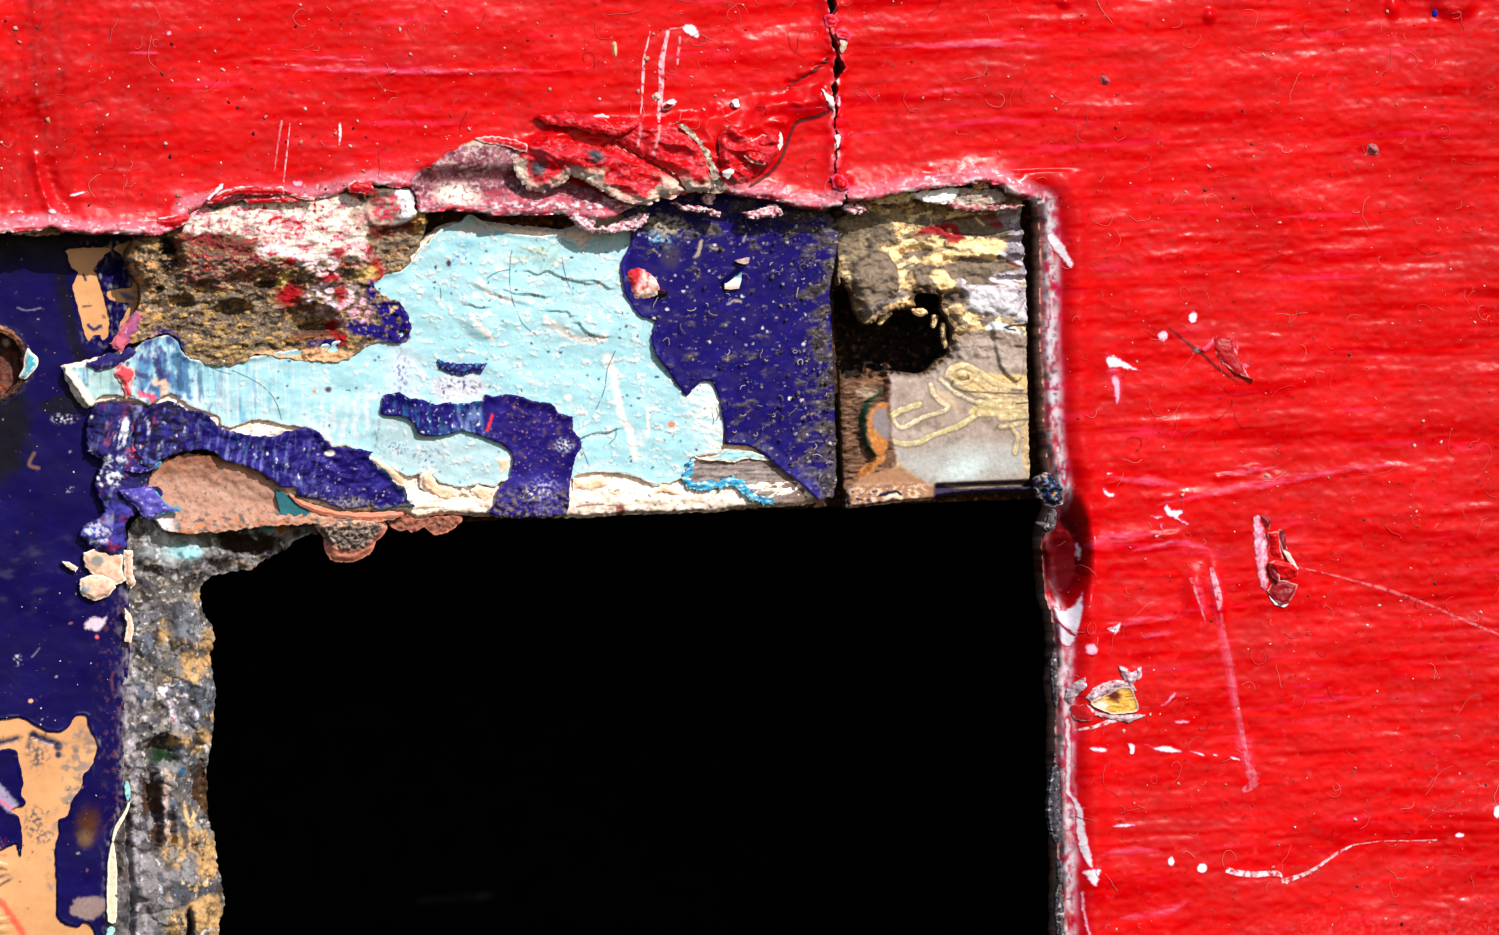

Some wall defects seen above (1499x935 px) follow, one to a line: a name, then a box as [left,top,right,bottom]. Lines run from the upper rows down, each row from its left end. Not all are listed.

crack [749,0,851,218]
spalling [11,208,66,237]
peeling [62,99,1025,601]
peeling [124,608,134,643]